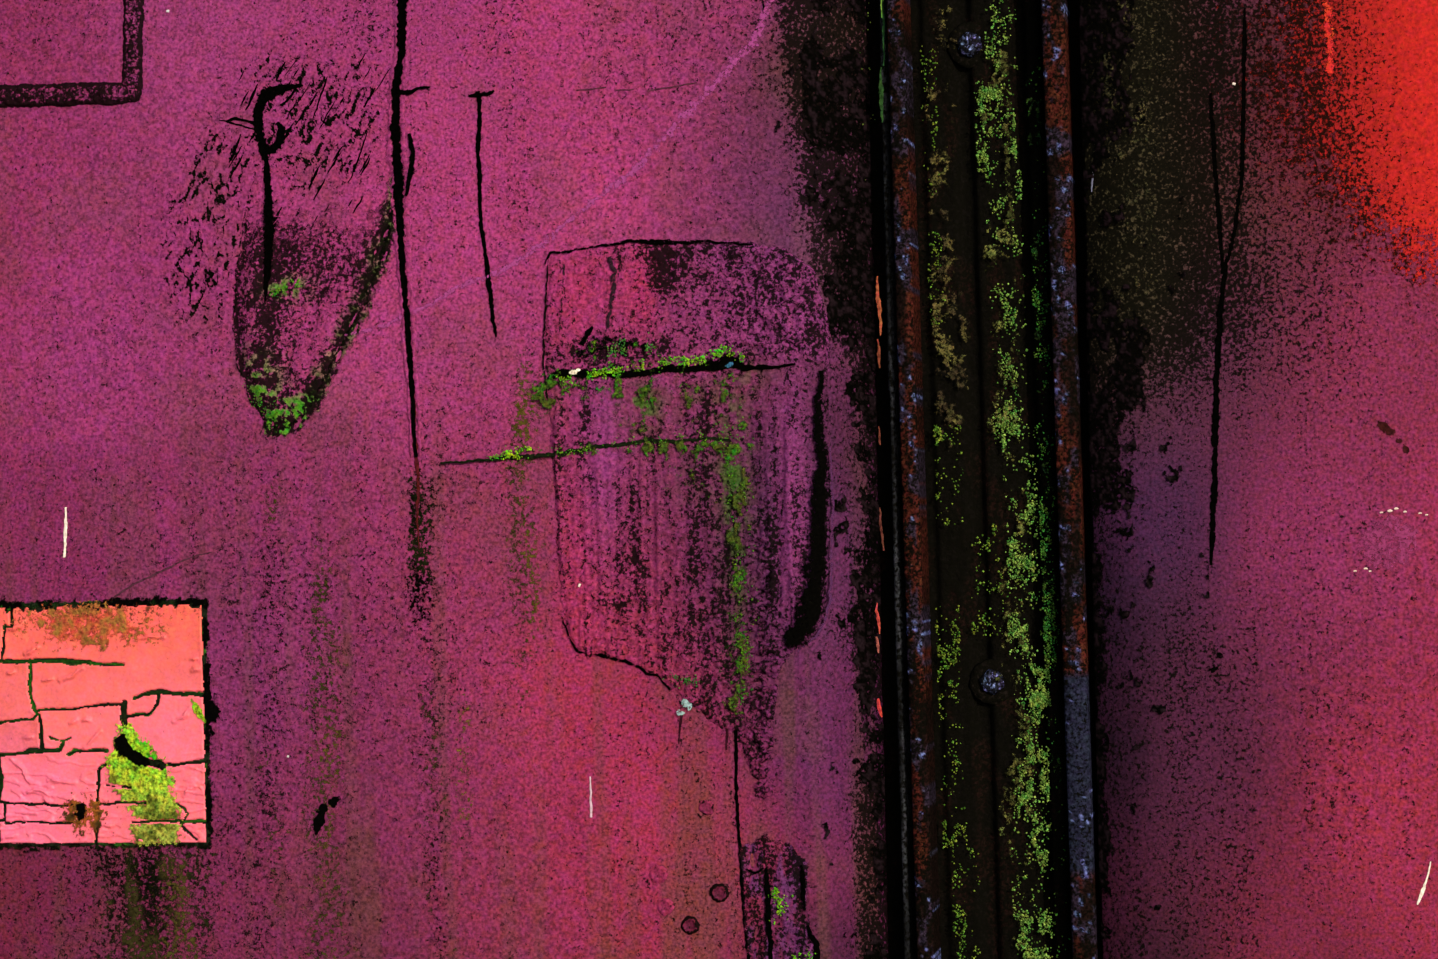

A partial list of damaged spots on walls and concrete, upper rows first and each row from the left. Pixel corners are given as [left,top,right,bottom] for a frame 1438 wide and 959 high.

crack [0,607,212,849]
leakage [77,846,235,959]